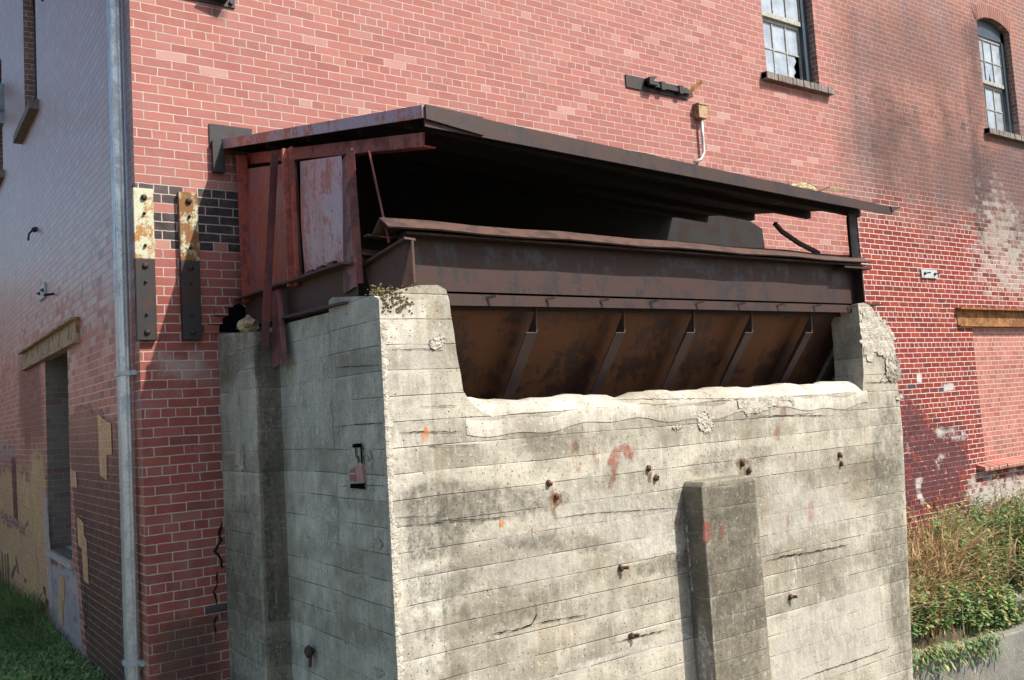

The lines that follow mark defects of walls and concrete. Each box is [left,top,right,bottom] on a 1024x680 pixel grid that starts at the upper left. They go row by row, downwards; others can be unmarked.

spalling [466,381,868,437]
peeling [0,448,53,622]
crack [213,522,223,633]
damp [570,494,693,590]